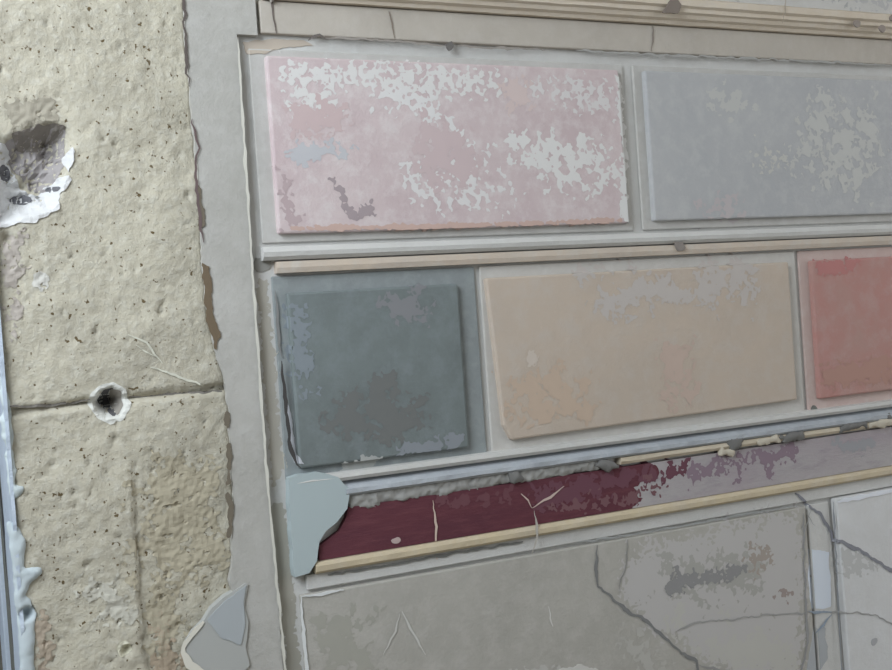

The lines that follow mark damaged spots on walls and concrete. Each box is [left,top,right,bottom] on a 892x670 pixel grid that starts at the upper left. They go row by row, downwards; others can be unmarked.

spalling [0,123,66,205]
peeling [278,58,629,224]
spalling [87,382,131,425]
peeling [340,454,383,471]
spalling [348,458,619,509]
peeling [547,474,669,515]
spalling [718,438,743,457]
spalling [757,430,805,446]
crack [328,486,564,575]
crack [574,493,892,670]
spalling [181,621,204,670]